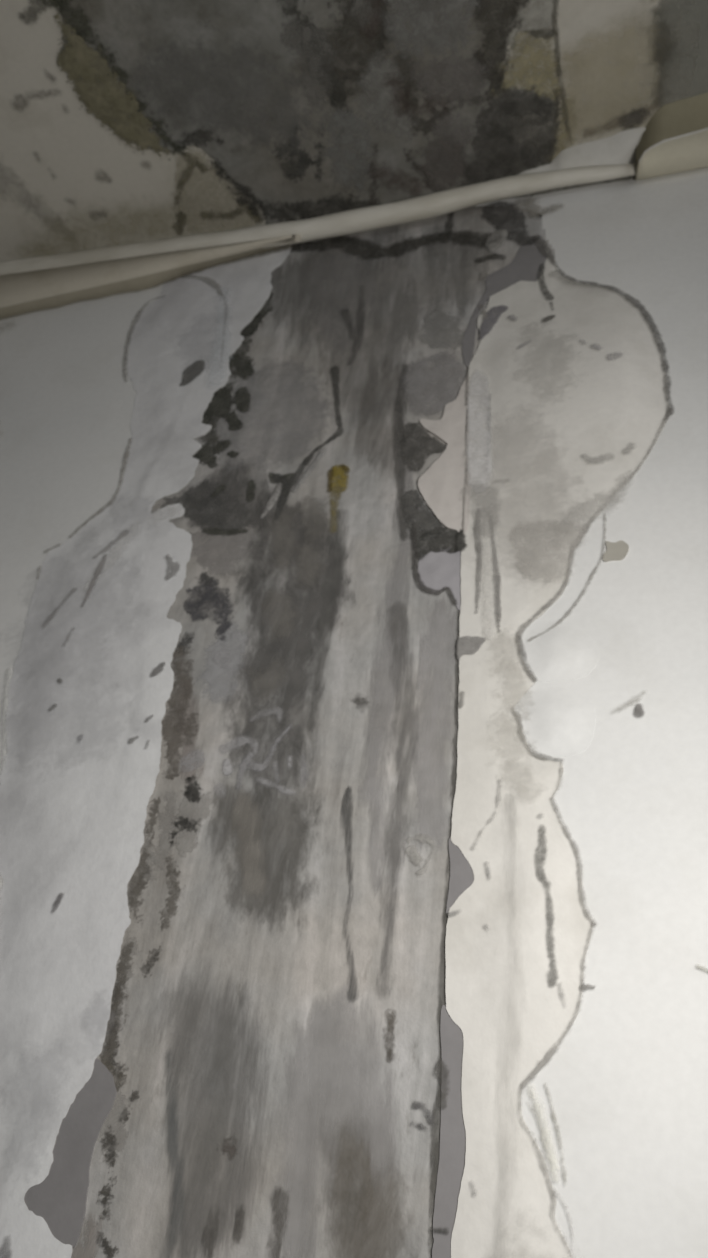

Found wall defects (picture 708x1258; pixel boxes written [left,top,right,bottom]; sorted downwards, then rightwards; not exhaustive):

damp [20,0,262,235]
damp [223,727,294,793]
peeling [0,205,555,1258]